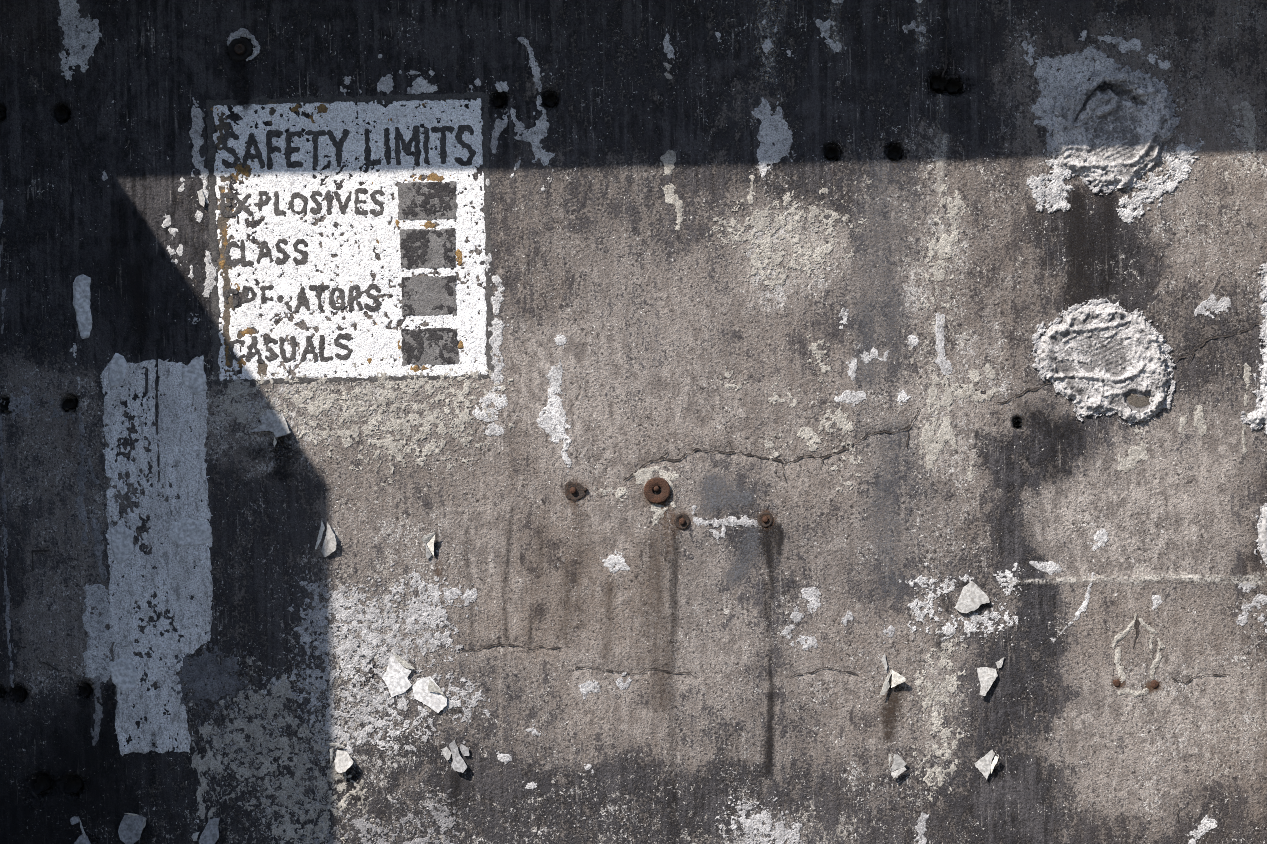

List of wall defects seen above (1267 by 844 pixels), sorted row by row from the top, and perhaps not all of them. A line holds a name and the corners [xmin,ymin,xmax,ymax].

crack [623,408,920,483]
peeling [62,274,491,844]
leakage [728,524,783,589]
peeling [782,587,822,651]
peeling [880,561,1062,696]
peeling [578,680,600,699]
peeling [616,672,632,690]
leakage [764,664,774,775]
peeling [496,751,512,764]
peeling [888,704,964,844]
peeling [974,750,999,779]